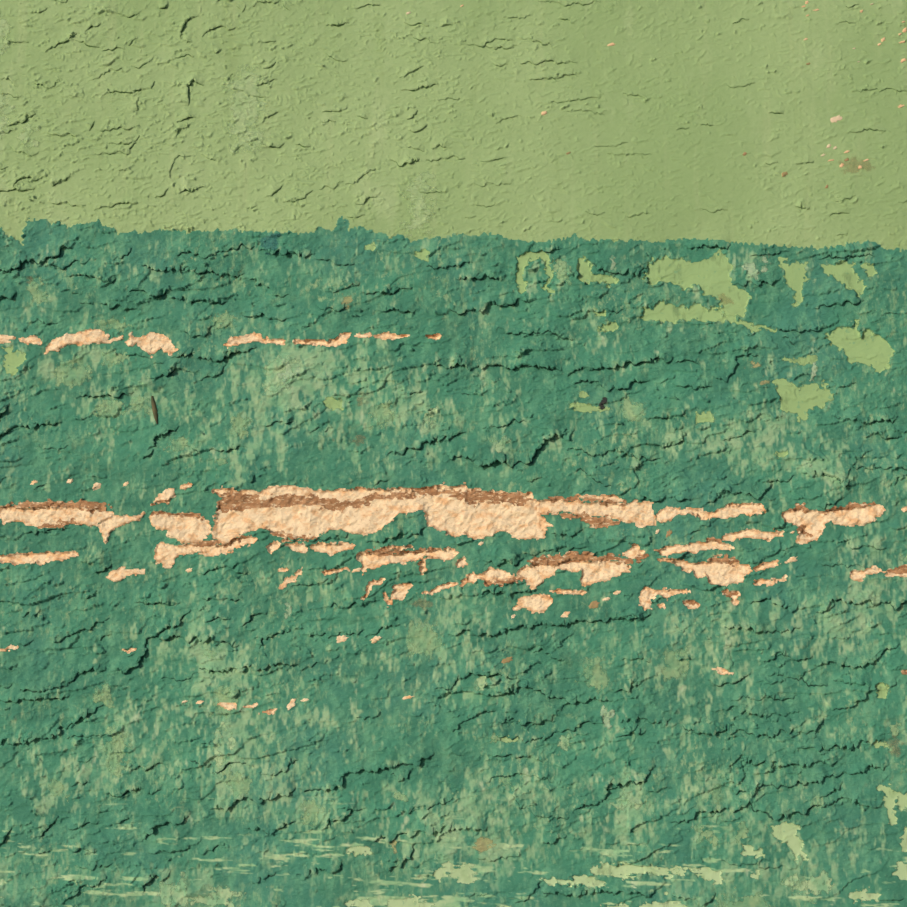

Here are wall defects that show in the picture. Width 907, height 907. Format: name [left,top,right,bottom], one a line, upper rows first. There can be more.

peeling [414,241,895,373]
peeling [695,411,714,424]
spalling [0,463,886,659]
peeling [117,596,268,674]
peeling [708,666,751,687]
peeling [0,684,163,777]
peeling [182,686,453,836]
peeling [486,713,907,907]
peeling [138,870,246,907]
peeling [345,899,372,907]
peeling [387,894,434,907]
peeling [433,861,478,884]